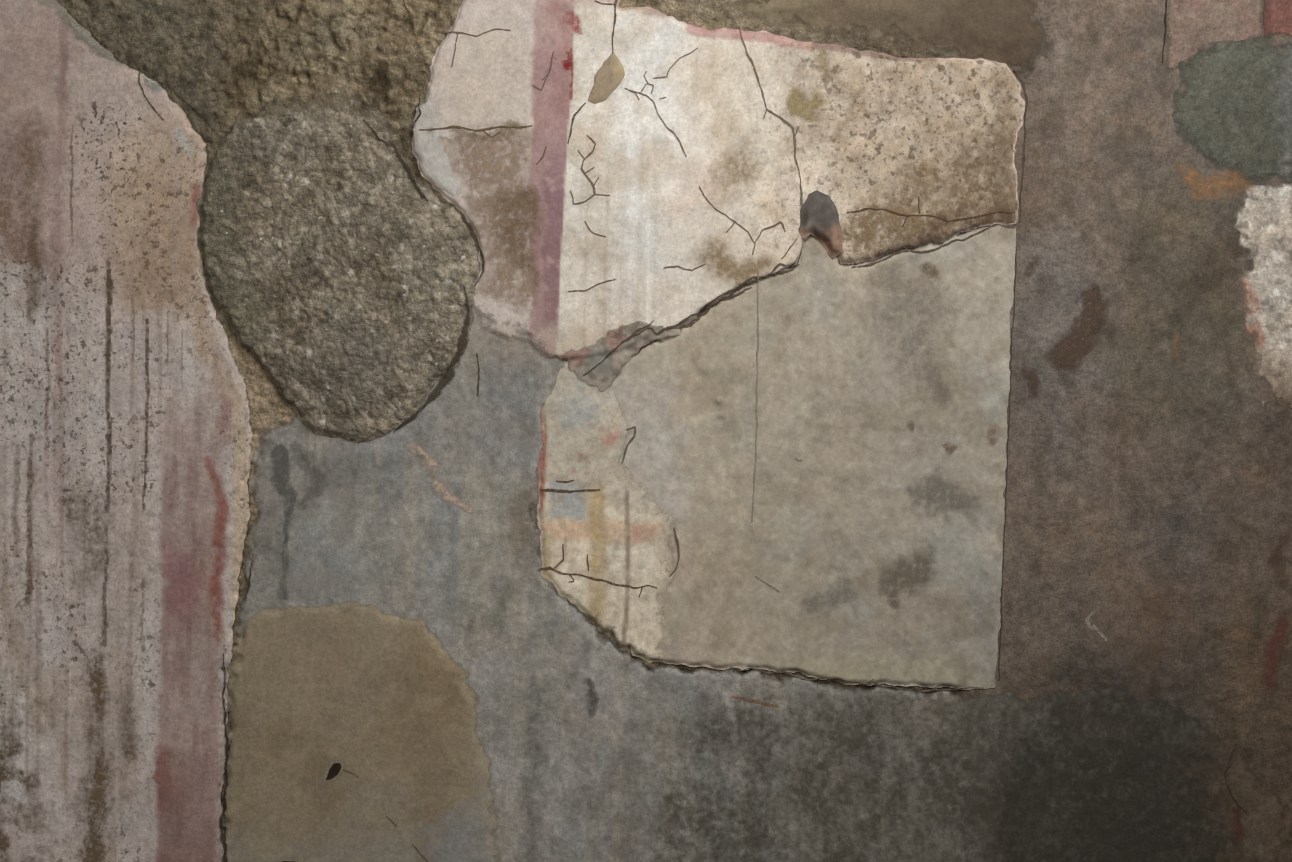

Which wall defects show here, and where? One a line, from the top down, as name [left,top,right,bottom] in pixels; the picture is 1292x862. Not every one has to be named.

crack [595,0,618,53]
flaking render [588,52,625,103]
flaking render [413,98,459,195]
crack [568,279,616,292]
crack [584,25,803,523]
flaking render [1236,184,1292,408]
crack [729,68,1028,692]
crack [540,480,600,493]
crack [538,527,680,597]